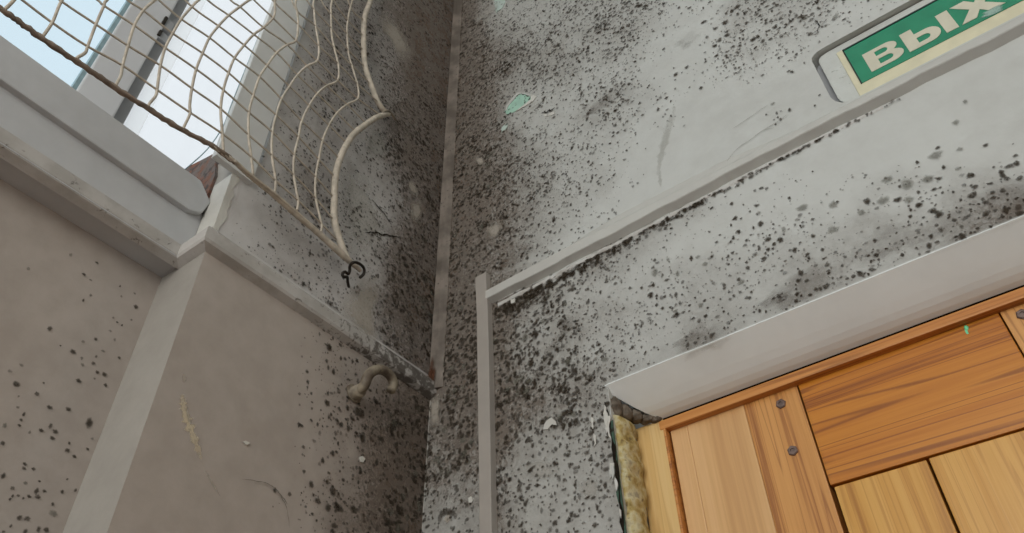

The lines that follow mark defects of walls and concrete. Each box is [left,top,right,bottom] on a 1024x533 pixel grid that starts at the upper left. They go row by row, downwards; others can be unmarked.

damp [1,463,56,515]
damp [239,0,871,533]
damp [492,111,1024,533]